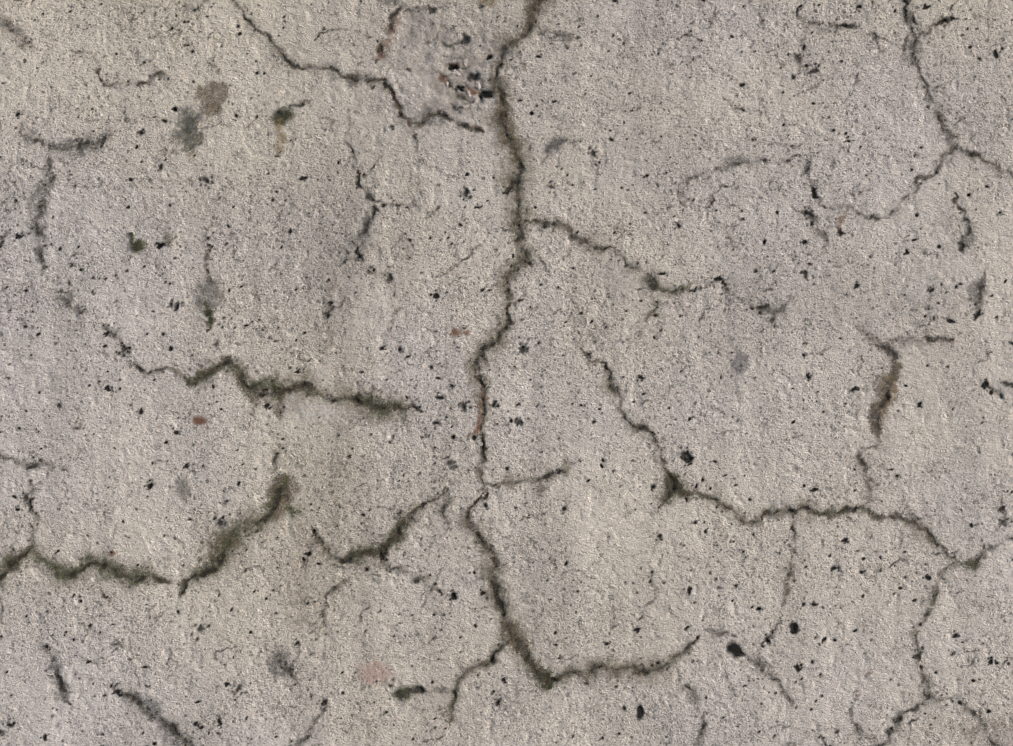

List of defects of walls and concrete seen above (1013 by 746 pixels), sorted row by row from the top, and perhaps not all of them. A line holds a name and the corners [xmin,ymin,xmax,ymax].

crack [71,50,165,87]
crack [0,110,128,287]
crack [59,289,422,439]
crack [235,0,1013,746]
crack [0,445,302,612]
crack [45,606,92,706]
crack [115,676,191,745]